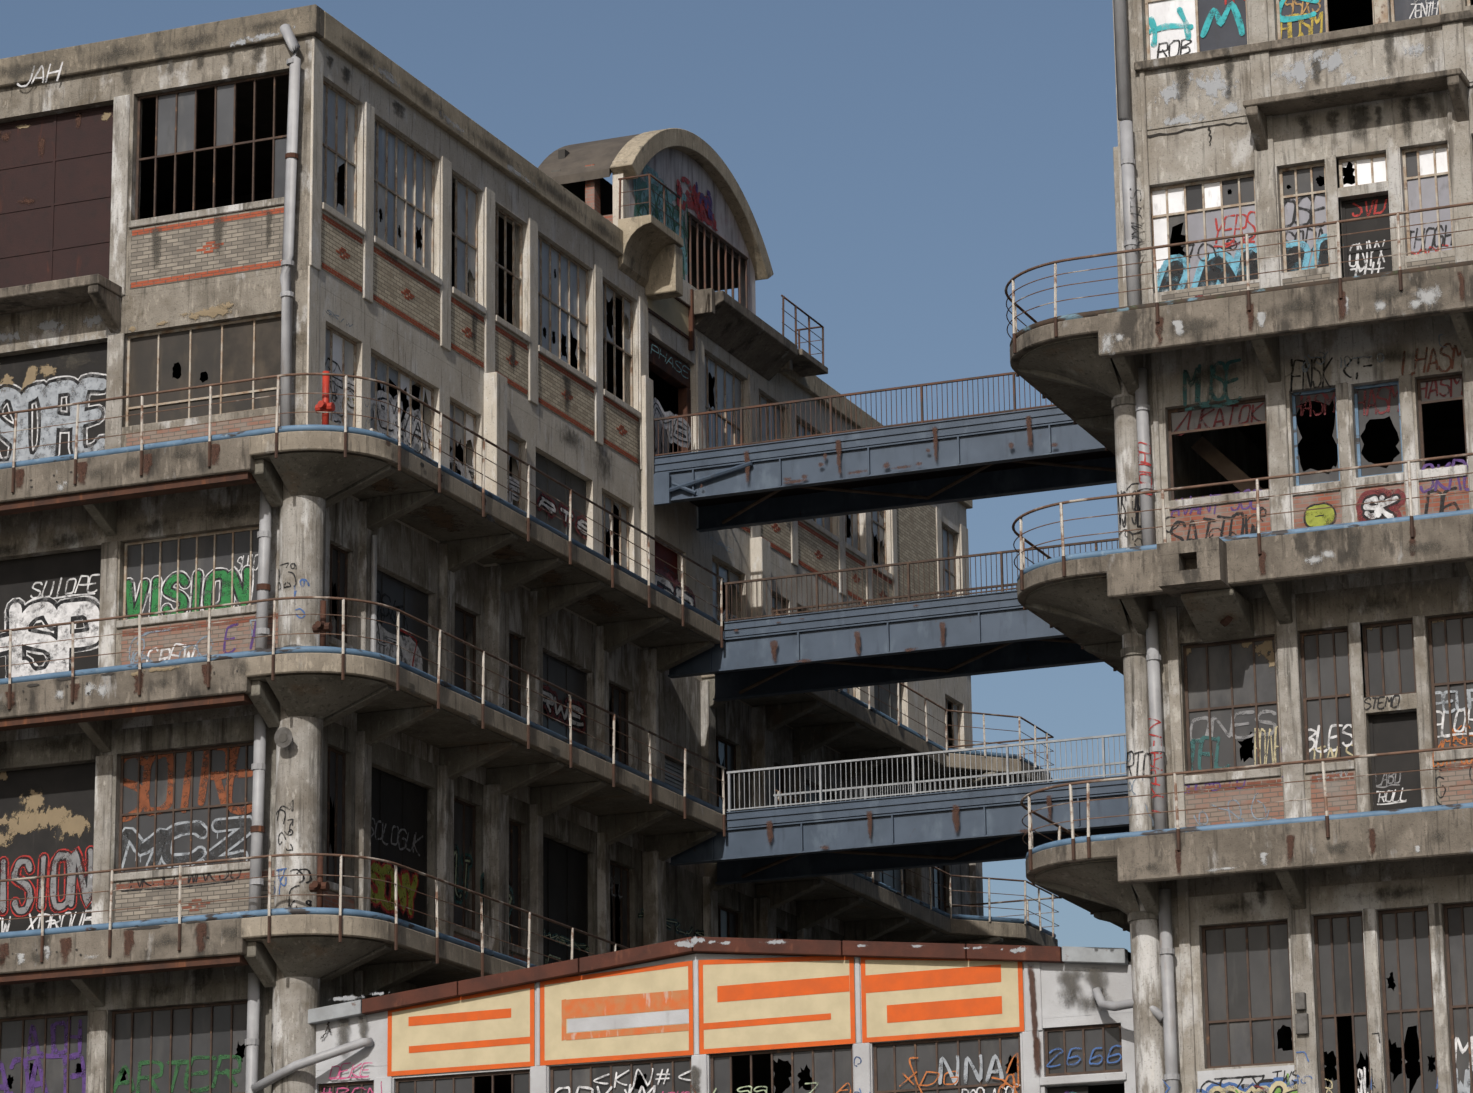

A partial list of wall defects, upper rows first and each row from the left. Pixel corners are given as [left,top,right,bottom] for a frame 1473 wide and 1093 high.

water stain [1385,35,1393,65]
water stain [1225,60,1233,96]
water stain [1312,49,1321,83]
crack [1147,122,1247,146]
water stain [1299,106,1381,139]
rust [15,469,25,488]
rust [77,461,88,483]
rust [60,937,72,962]
rust [124,930,134,956]
rust [196,923,206,951]
water stain [1058,968,1106,1007]
water stain [339,1015,367,1046]